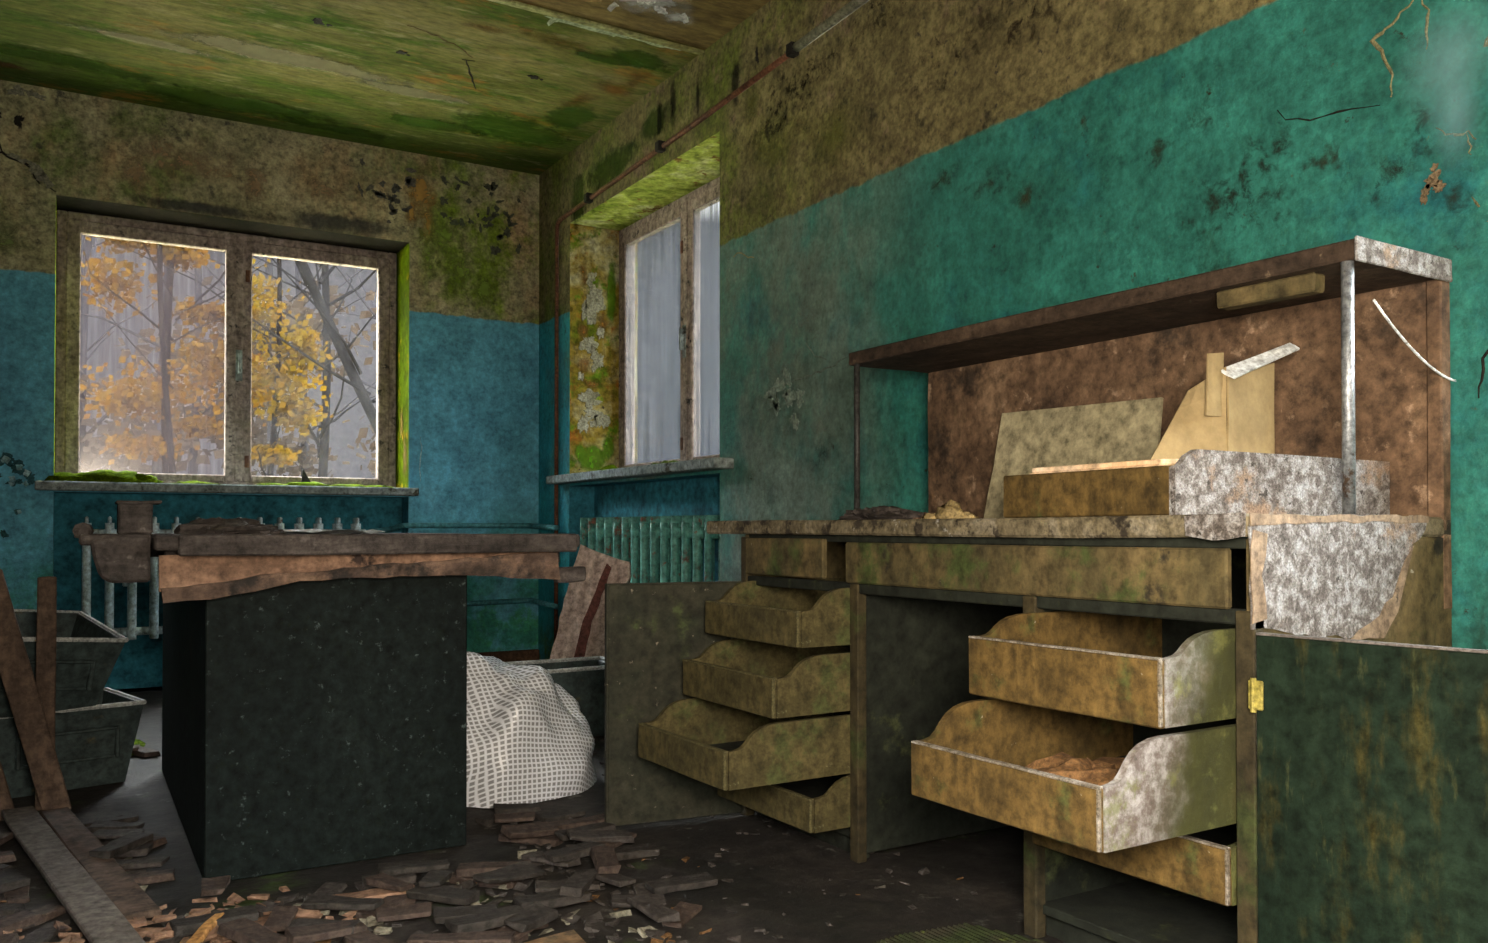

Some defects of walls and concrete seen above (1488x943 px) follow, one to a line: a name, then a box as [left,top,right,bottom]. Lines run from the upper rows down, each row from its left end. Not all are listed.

spalling [637,0,689,24]
peeling [545,16,682,51]
damp [69,25,470,104]
damp [731,65,739,104]
damp [658,84,676,134]
crack [1436,127,1476,155]
crack [0,144,56,192]
crack [1478,349,1488,398]
peeling [0,452,35,487]